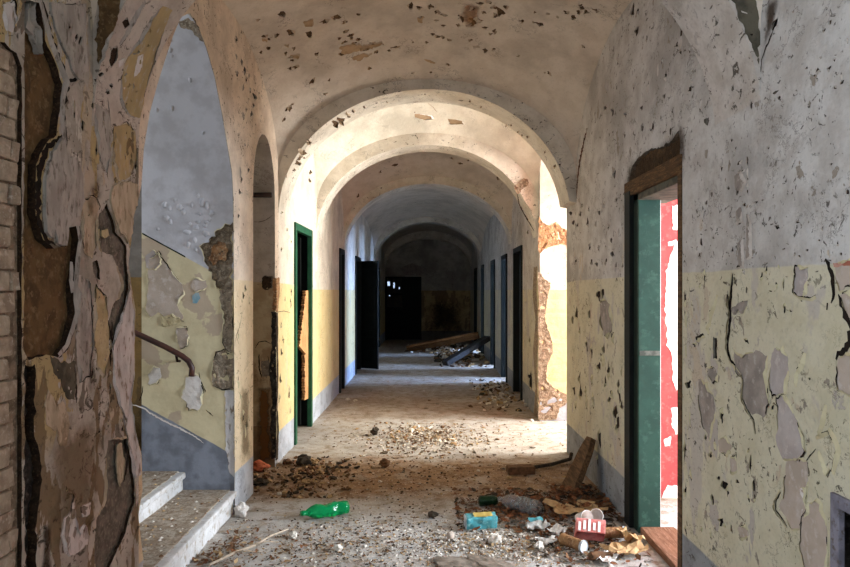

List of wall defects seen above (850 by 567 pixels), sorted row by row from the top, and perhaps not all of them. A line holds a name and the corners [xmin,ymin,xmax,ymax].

peeling [303,14,400,61]
flaking render [331,106,366,128]
flaking render [0,0,173,567]
peeling [145,250,200,350]
peeling [181,373,204,411]
spalling [199,214,248,477]
spalling [525,266,622,435]
peeling [662,240,739,498]
crack [725,273,756,434]
peeling [734,338,806,462]
crack [793,259,850,360]
peeling [833,242,850,318]